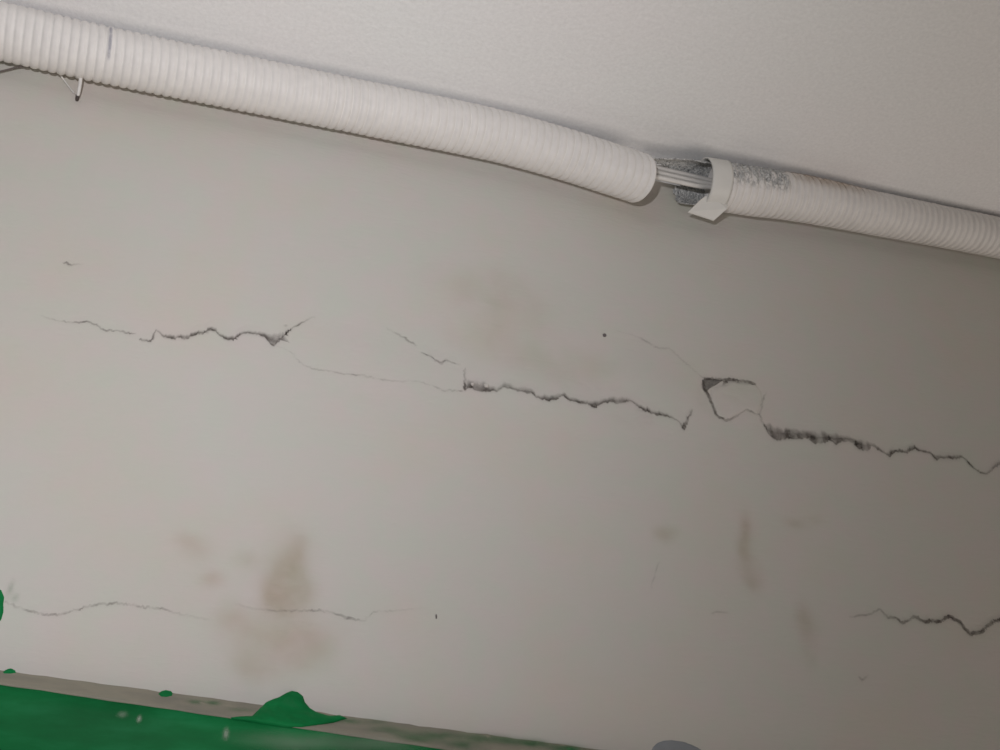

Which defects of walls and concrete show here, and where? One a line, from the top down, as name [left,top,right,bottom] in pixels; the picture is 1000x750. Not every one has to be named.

crack [149,319,299,345]
crack [463,379,689,430]
flaking render [702,378,762,420]
crack [764,422,1000,473]
crack [895,606,1000,636]